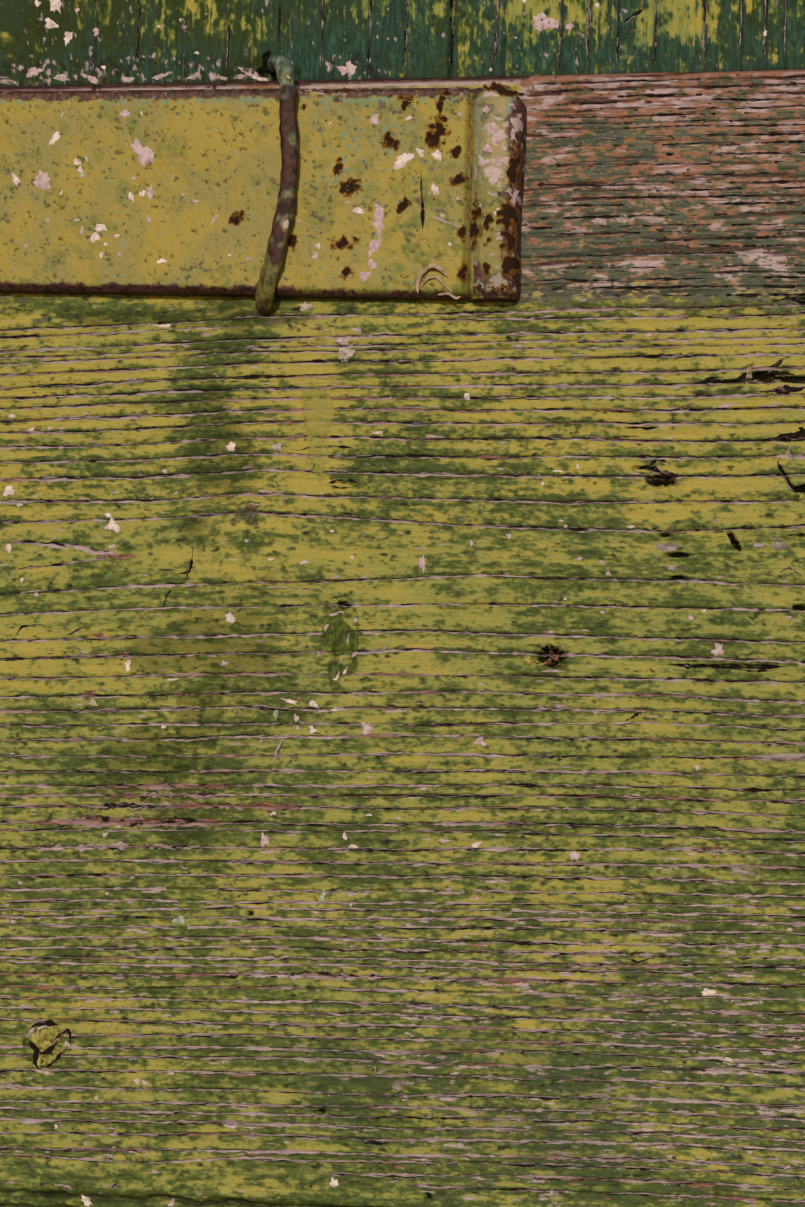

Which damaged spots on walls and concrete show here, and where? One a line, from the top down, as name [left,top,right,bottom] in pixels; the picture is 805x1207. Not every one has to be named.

corrosion [483,81,518,96]
corrosion [397,93,414,111]
corrosion [381,131,400,151]
corrosion [425,91,469,186]
corrosion [333,157,361,197]
corrosion [396,195,412,214]
corrosion [457,142,522,294]
corrosion [288,234,298,252]
corrosion [330,235,359,250]